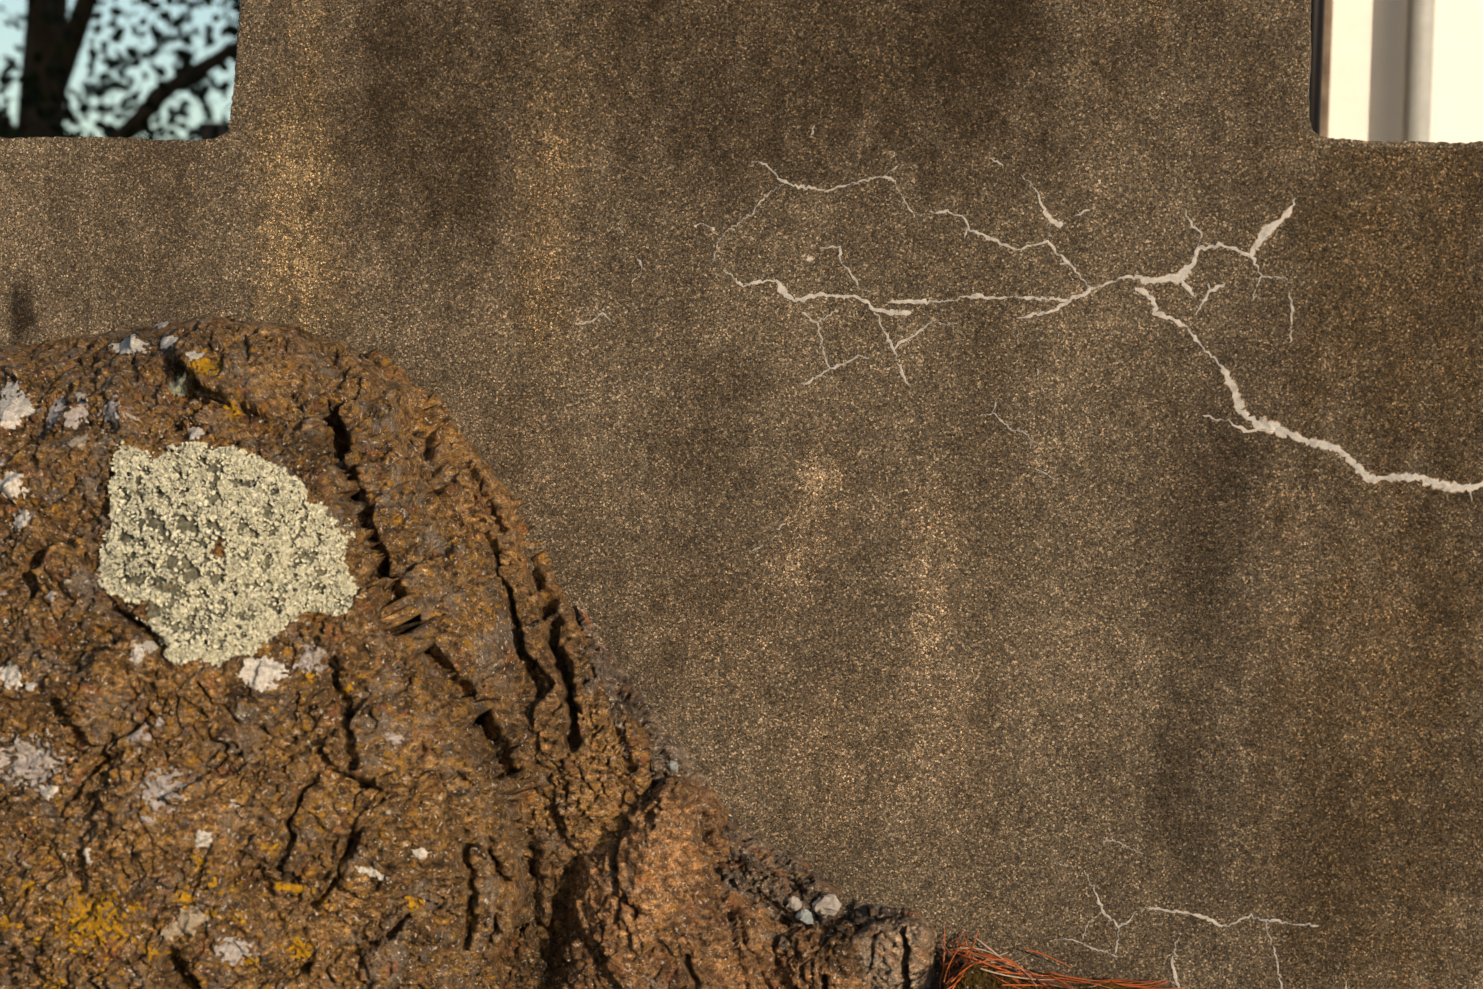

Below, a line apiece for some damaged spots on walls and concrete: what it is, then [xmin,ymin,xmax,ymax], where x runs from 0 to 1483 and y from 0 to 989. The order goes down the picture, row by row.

crack [693,153,1483,502]
crack [1055,839,1319,989]